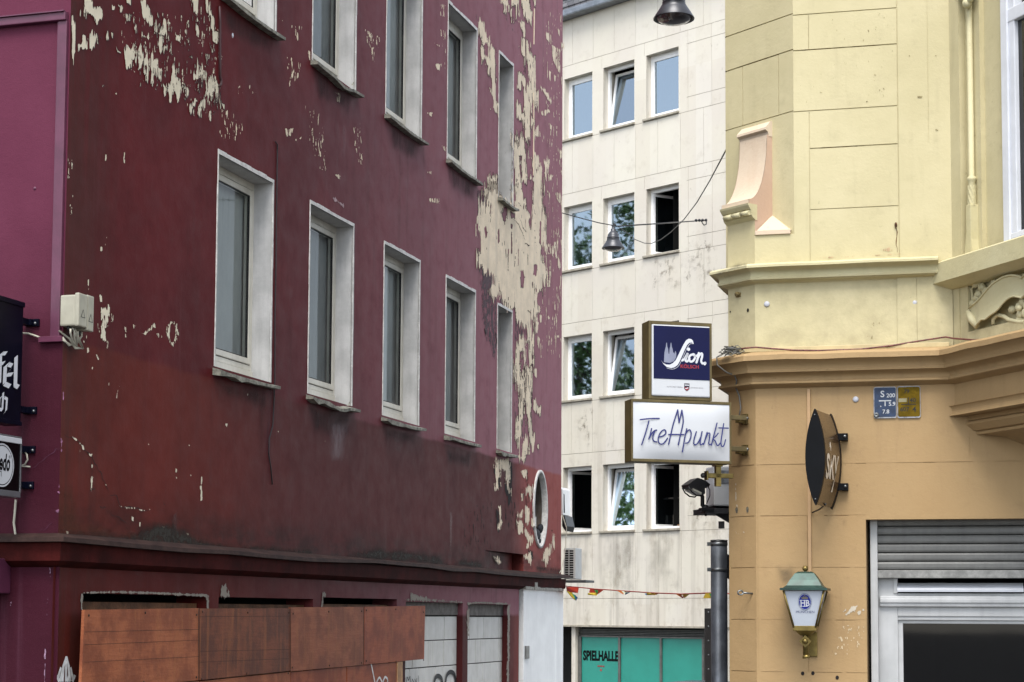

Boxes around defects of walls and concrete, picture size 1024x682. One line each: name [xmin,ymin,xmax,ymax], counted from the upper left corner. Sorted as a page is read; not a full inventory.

peeling [71,0,243,140]
peeling [83,279,113,369]
peeling [476,0,564,567]